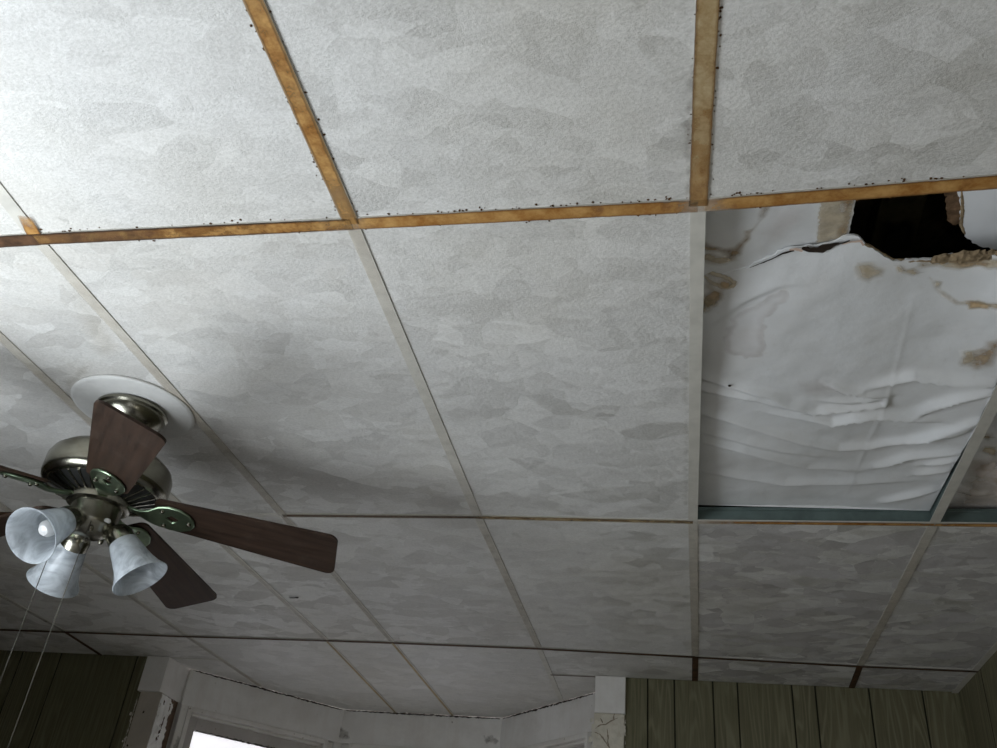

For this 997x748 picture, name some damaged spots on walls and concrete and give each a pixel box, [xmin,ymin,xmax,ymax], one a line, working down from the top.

corrosion [0,0,997,248]
leakage [703,239,747,311]
leakage [963,344,997,366]
peeling [147,694,173,748]